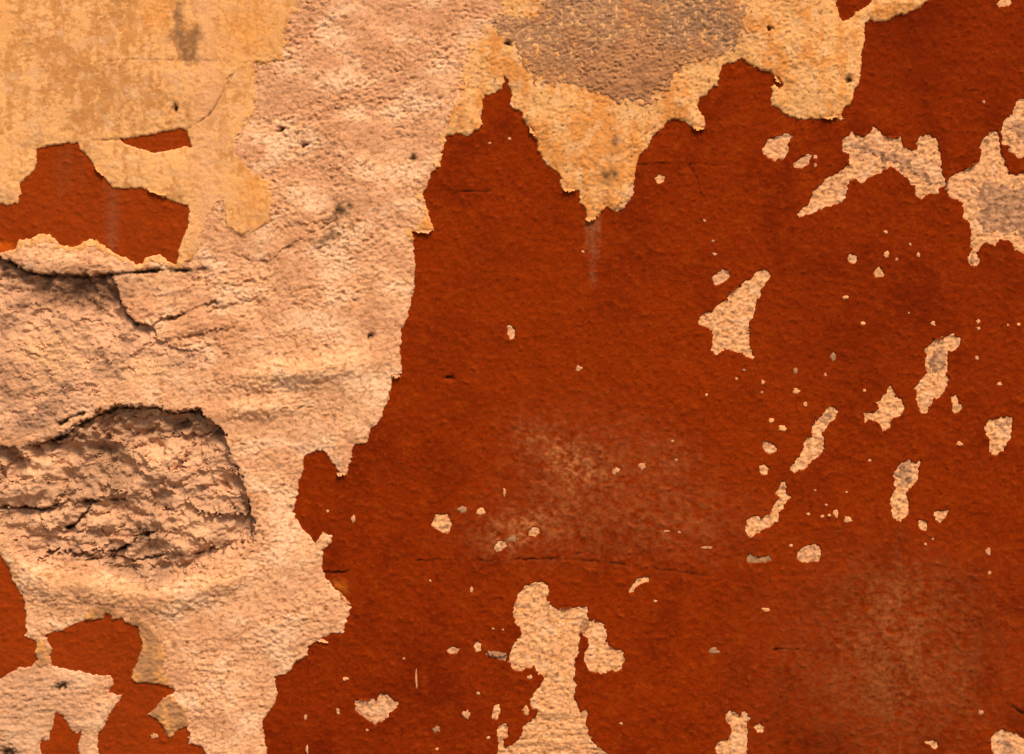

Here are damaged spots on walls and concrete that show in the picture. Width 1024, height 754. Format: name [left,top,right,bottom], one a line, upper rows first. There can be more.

peeling [438,0,928,222]
peeling [797,99,1024,268]
crack [76,268,189,278]
crack [120,302,202,336]
peeling [698,269,770,359]
flaking render [0,0,546,754]
peeling [864,385,904,432]
peeling [914,334,962,413]
peeling [745,406,838,538]
peeling [890,460,949,531]
peeling [474,582,625,754]
peeling [715,711,764,754]